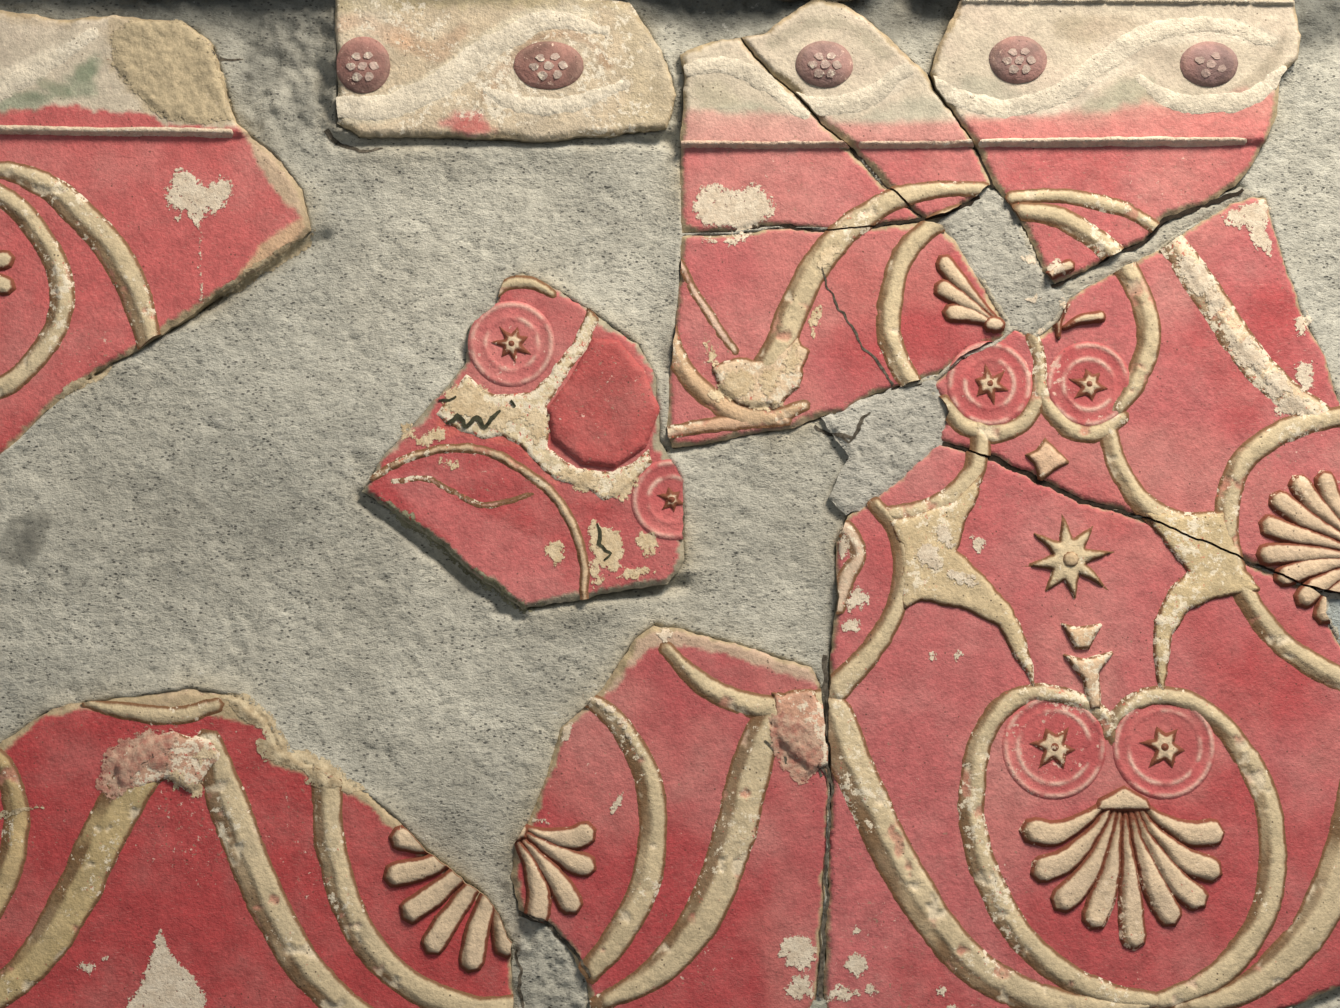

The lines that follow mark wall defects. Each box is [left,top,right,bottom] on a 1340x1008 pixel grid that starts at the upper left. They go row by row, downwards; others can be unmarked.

crack [1051,189,1244,288]
crack [942,442,1340,594]
spalling [95,726,219,802]
spalling [768,711,824,785]
crack [764,655,834,998]